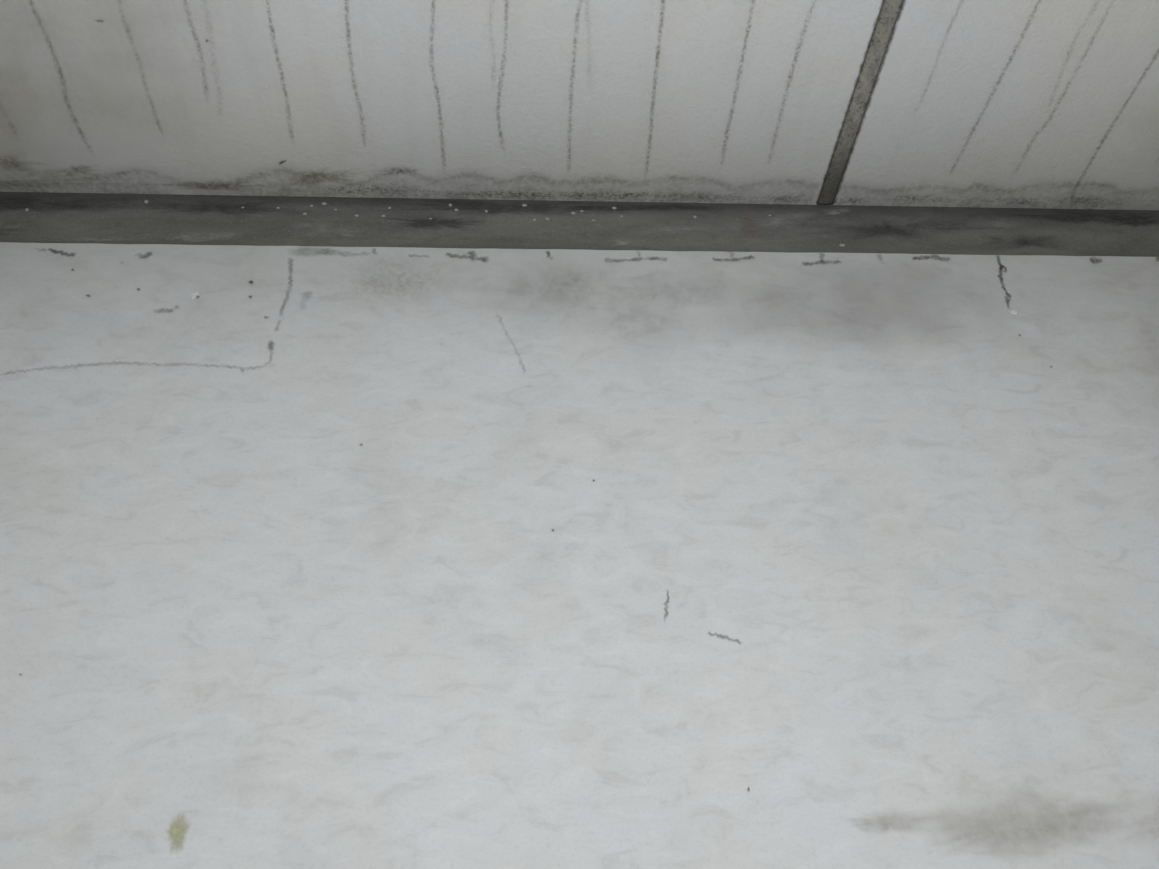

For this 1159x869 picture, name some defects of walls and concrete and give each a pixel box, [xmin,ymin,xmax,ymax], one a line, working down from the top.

crack [998,260,1017,315]